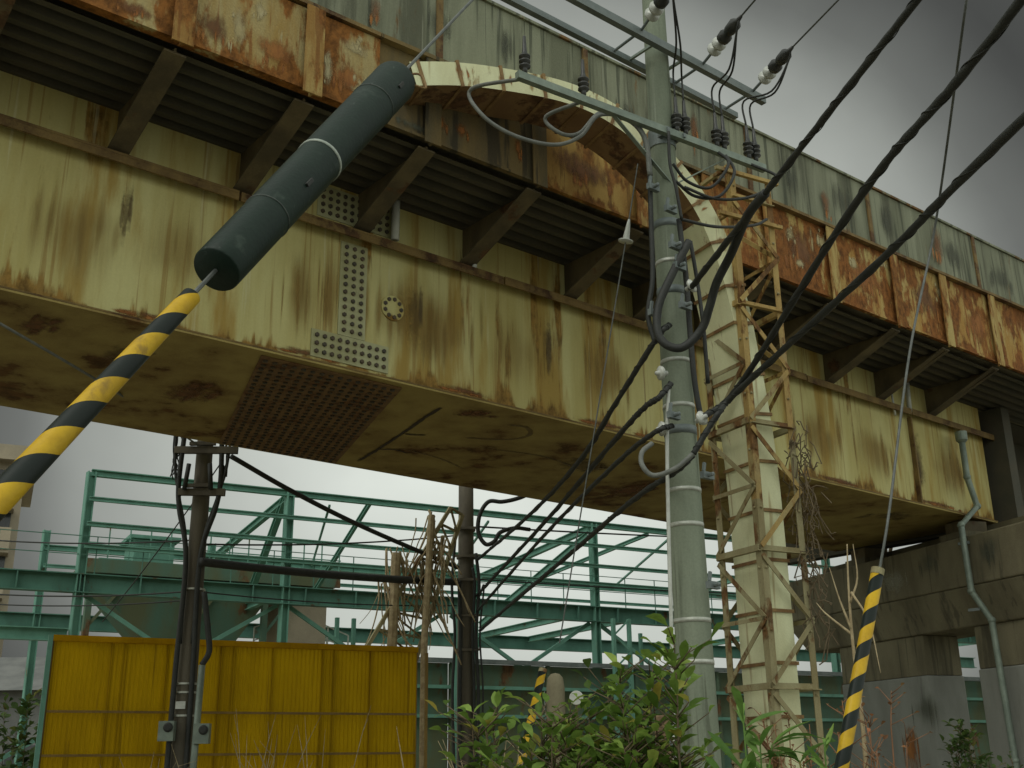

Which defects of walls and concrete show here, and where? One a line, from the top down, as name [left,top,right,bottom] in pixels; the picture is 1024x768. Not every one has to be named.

corrosion [117,4,150,18]